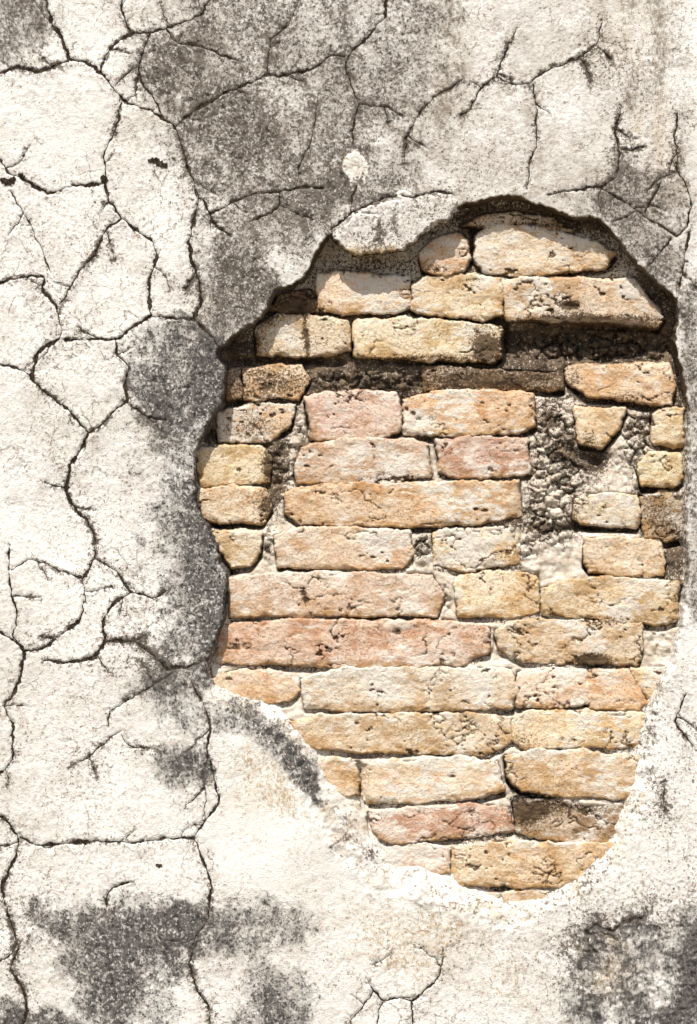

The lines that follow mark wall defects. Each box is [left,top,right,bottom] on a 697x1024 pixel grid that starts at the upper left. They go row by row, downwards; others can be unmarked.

crack [548,109,693,292]
damp [109,0,472,789]
crack [0,0,610,779]
spalling [194,190,690,927]
crack [674,693,697,746]
crack [0,683,220,1024]
damp [0,887,321,1024]
crack [351,948,444,1024]
crack [587,917,641,948]
damp [666,912,697,1024]